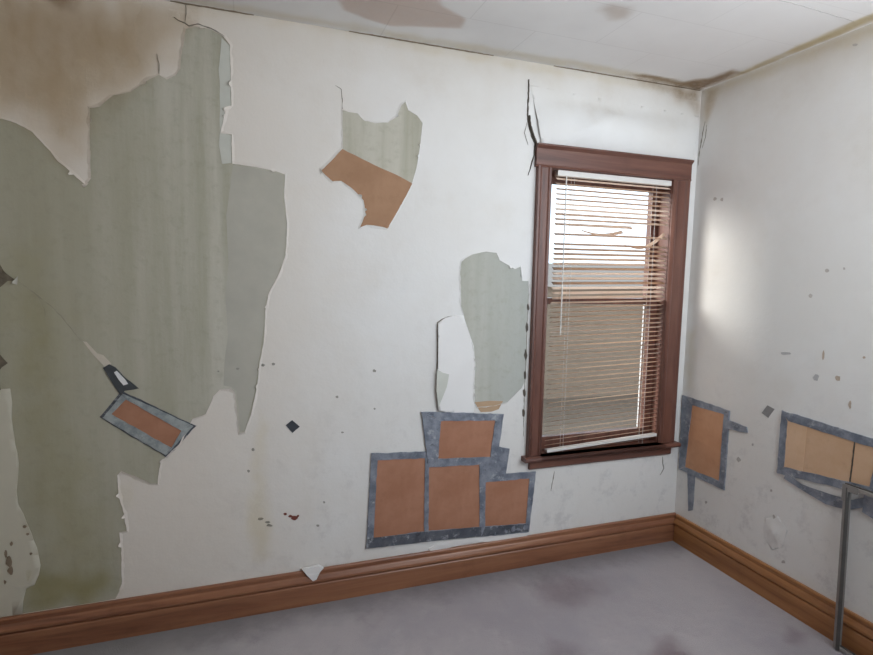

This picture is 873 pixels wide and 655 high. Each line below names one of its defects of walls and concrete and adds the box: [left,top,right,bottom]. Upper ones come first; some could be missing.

flaking render [343,102,423,183]
crack [524,79,537,175]
flaking render [0,27,287,614]
flaking render [460,252,528,403]